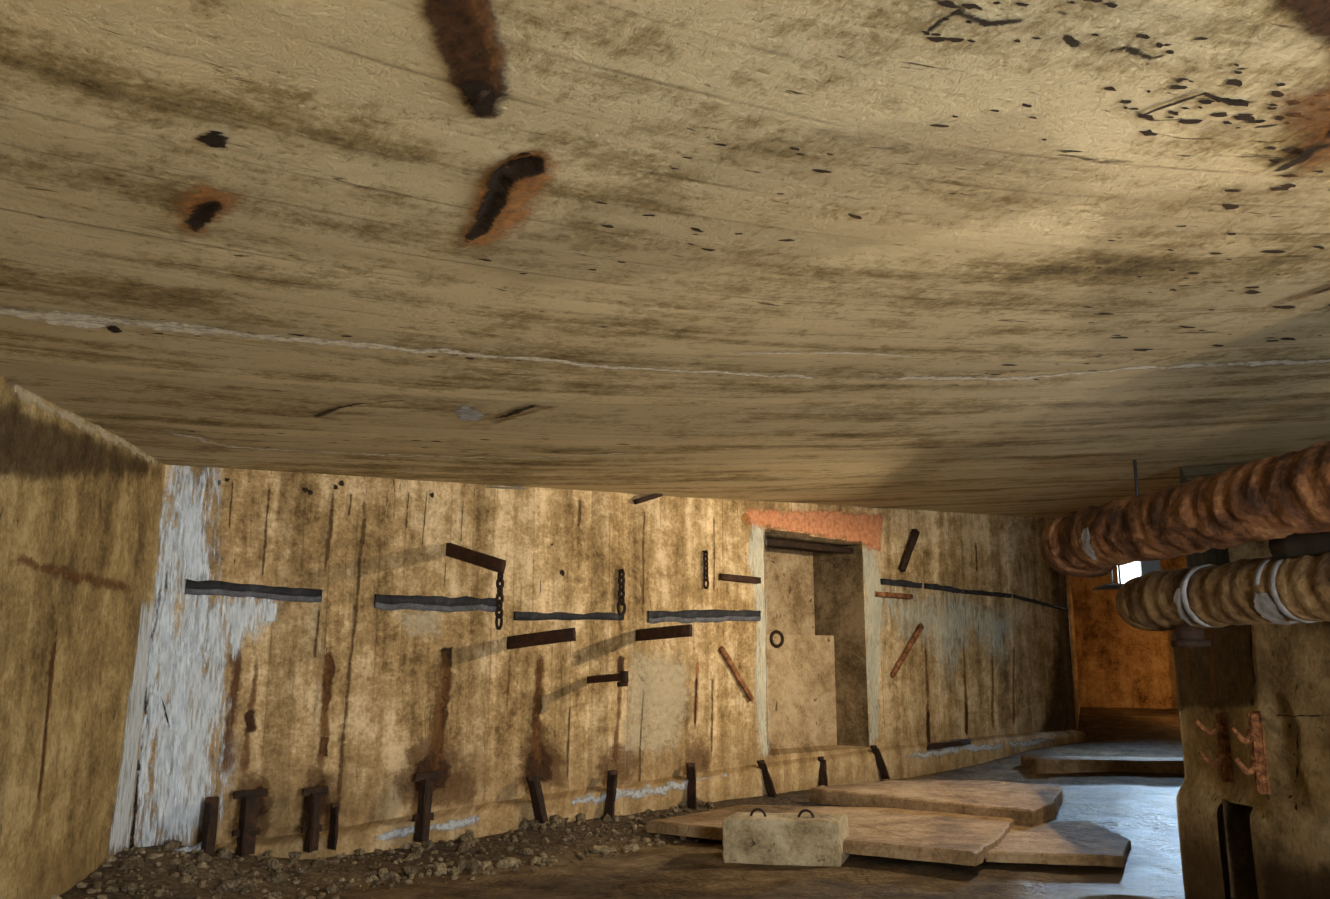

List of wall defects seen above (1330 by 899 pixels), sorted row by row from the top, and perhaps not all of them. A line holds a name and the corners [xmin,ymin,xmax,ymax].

corrosion [1279,0,1330,44]
corrosion [423,0,508,118]
leakage [0,407,148,479]
leakage [109,465,277,852]
efflorescence [375,816,480,841]